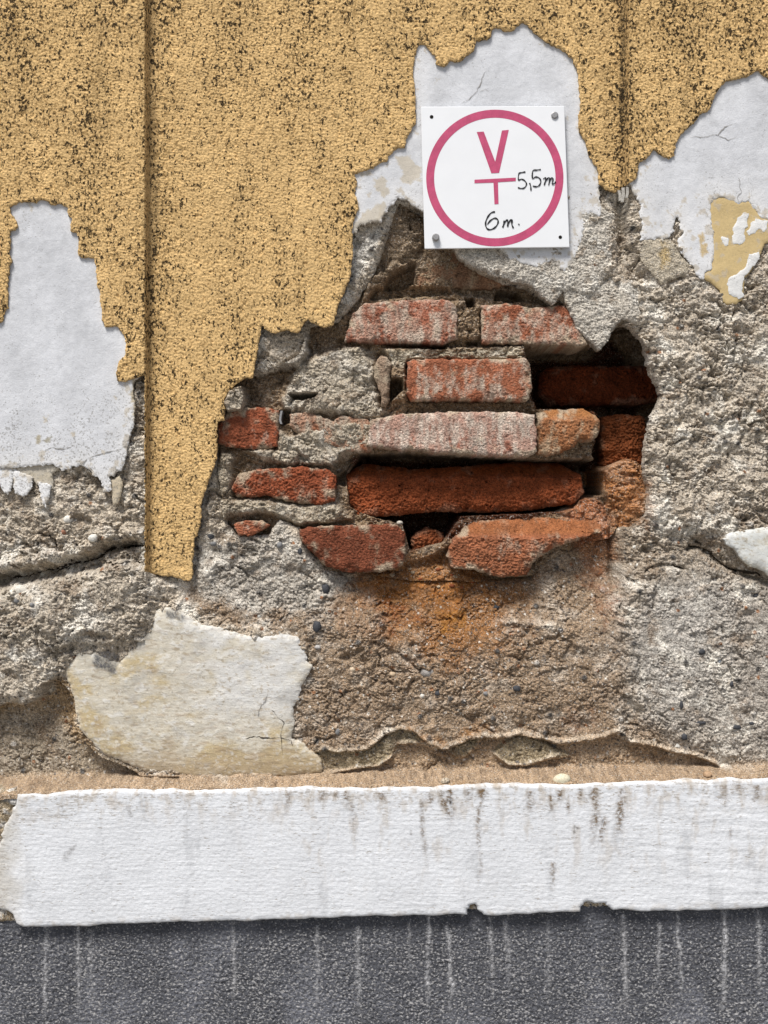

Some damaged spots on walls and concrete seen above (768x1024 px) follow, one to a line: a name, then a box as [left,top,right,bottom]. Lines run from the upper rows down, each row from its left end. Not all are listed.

crack [13,533,144,578]
spalling [0,23,768,842]